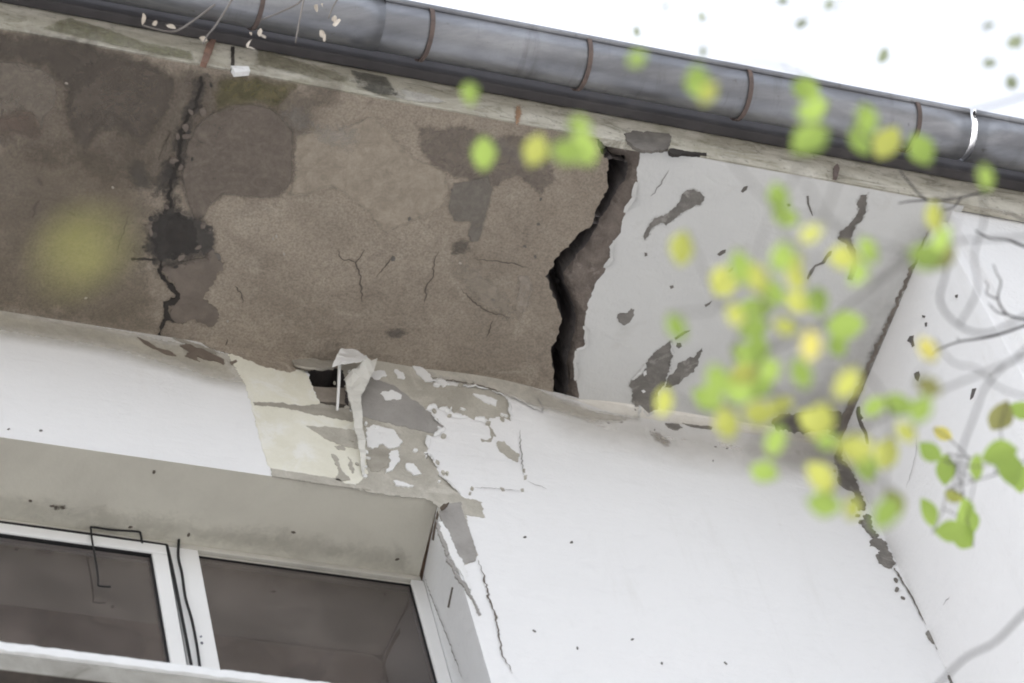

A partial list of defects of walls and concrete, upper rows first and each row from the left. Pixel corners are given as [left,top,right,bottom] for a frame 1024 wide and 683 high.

crack [113,46,235,335]
damp [0,33,554,254]
flaking render [137,336,527,591]
crack [338,251,391,301]
crack [424,252,439,302]
crack [445,139,707,413]
peeling [617,309,634,325]
peeling [629,330,702,418]
peeling [643,189,705,240]
peeling [838,194,867,251]
crack [829,232,953,683]
crack [424,502,513,677]